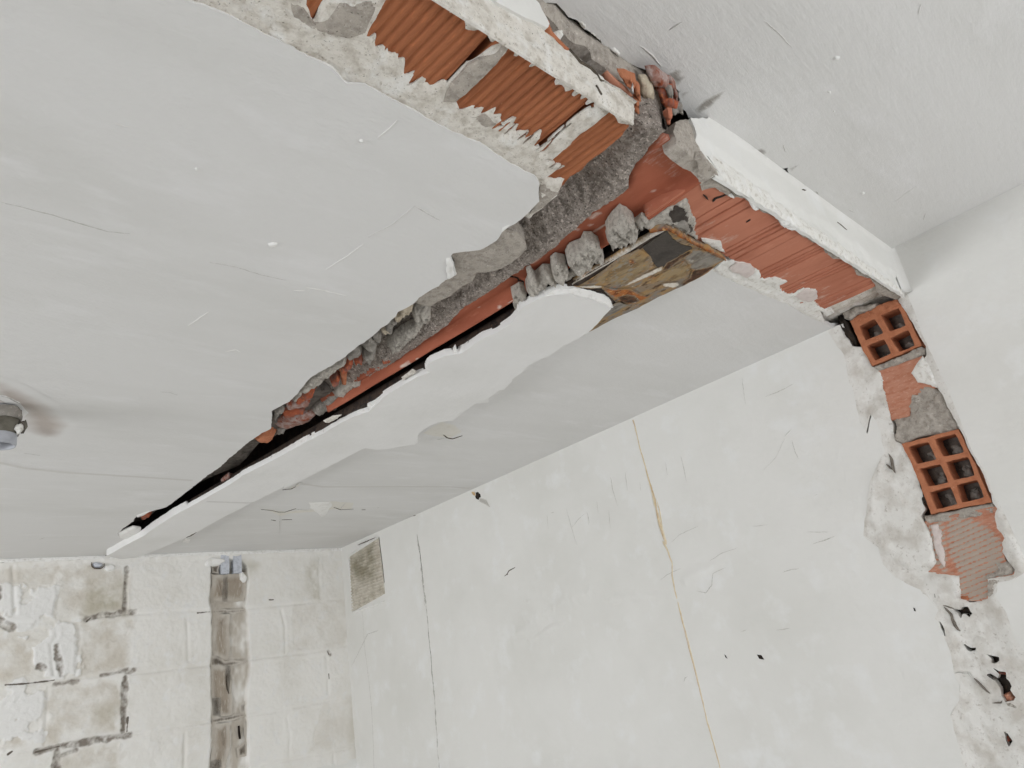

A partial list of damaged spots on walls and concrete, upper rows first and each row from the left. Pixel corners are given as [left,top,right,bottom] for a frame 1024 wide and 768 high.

spalling [118,510,156,539]
spalling [186,431,316,505]
spalling [193,0,905,484]
spalling [713,256,1024,768]